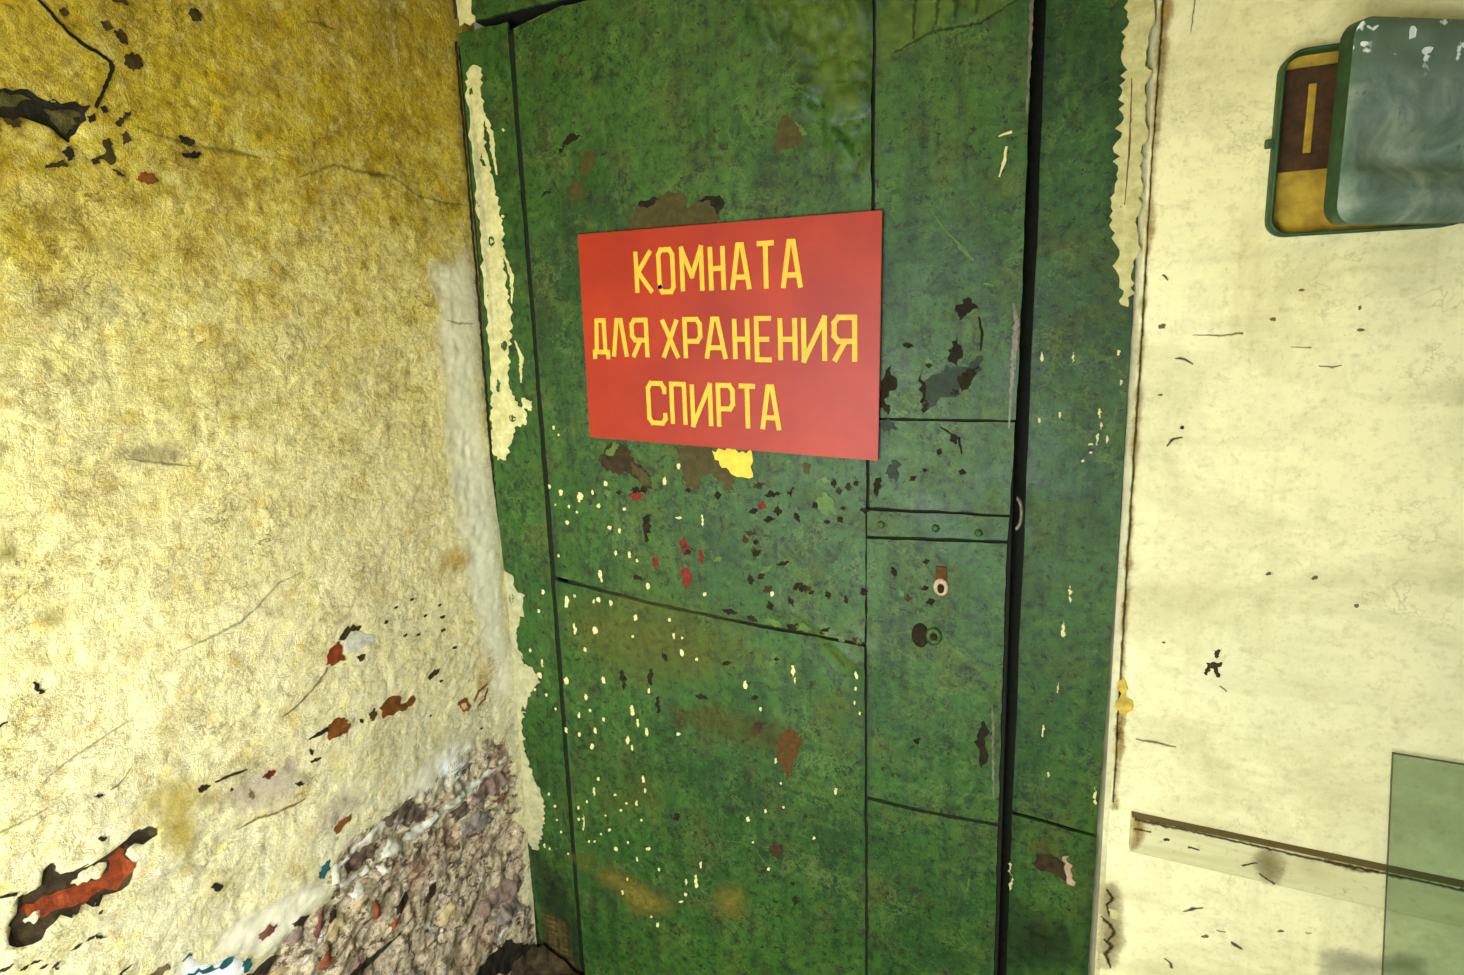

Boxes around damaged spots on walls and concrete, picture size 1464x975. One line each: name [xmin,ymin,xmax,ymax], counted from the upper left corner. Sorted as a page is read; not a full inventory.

crack [38,0,115,108]
spalling [0,88,159,185]
peeling [509,398,532,422]
peeling [283,598,414,717]
peeling [309,695,416,763]
flaking render [0,826,158,973]
spalling [149,727,540,975]